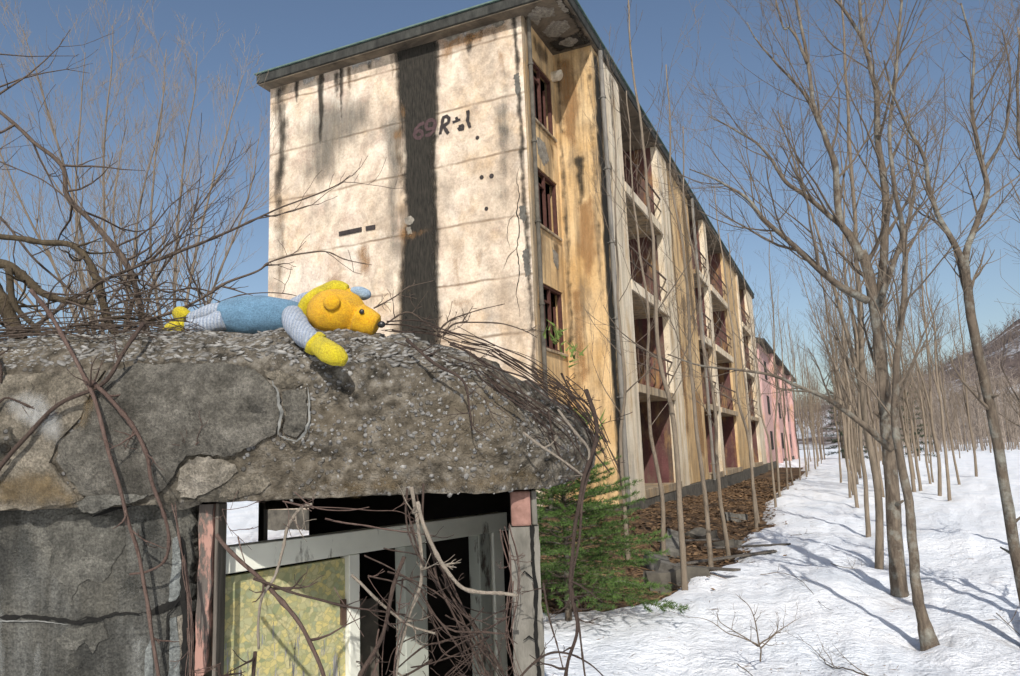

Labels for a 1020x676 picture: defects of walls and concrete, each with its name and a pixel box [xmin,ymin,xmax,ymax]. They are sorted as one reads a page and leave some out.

leakage [276,81,299,204]
leakage [314,68,356,171]
leakage [389,40,440,345]
corrosion [559,61,577,140]
corrosion [580,201,594,271]
flaking render [0,362,308,606]
crack [0,537,188,676]
flaking render [144,640,154,676]
flaking render [168,615,183,676]